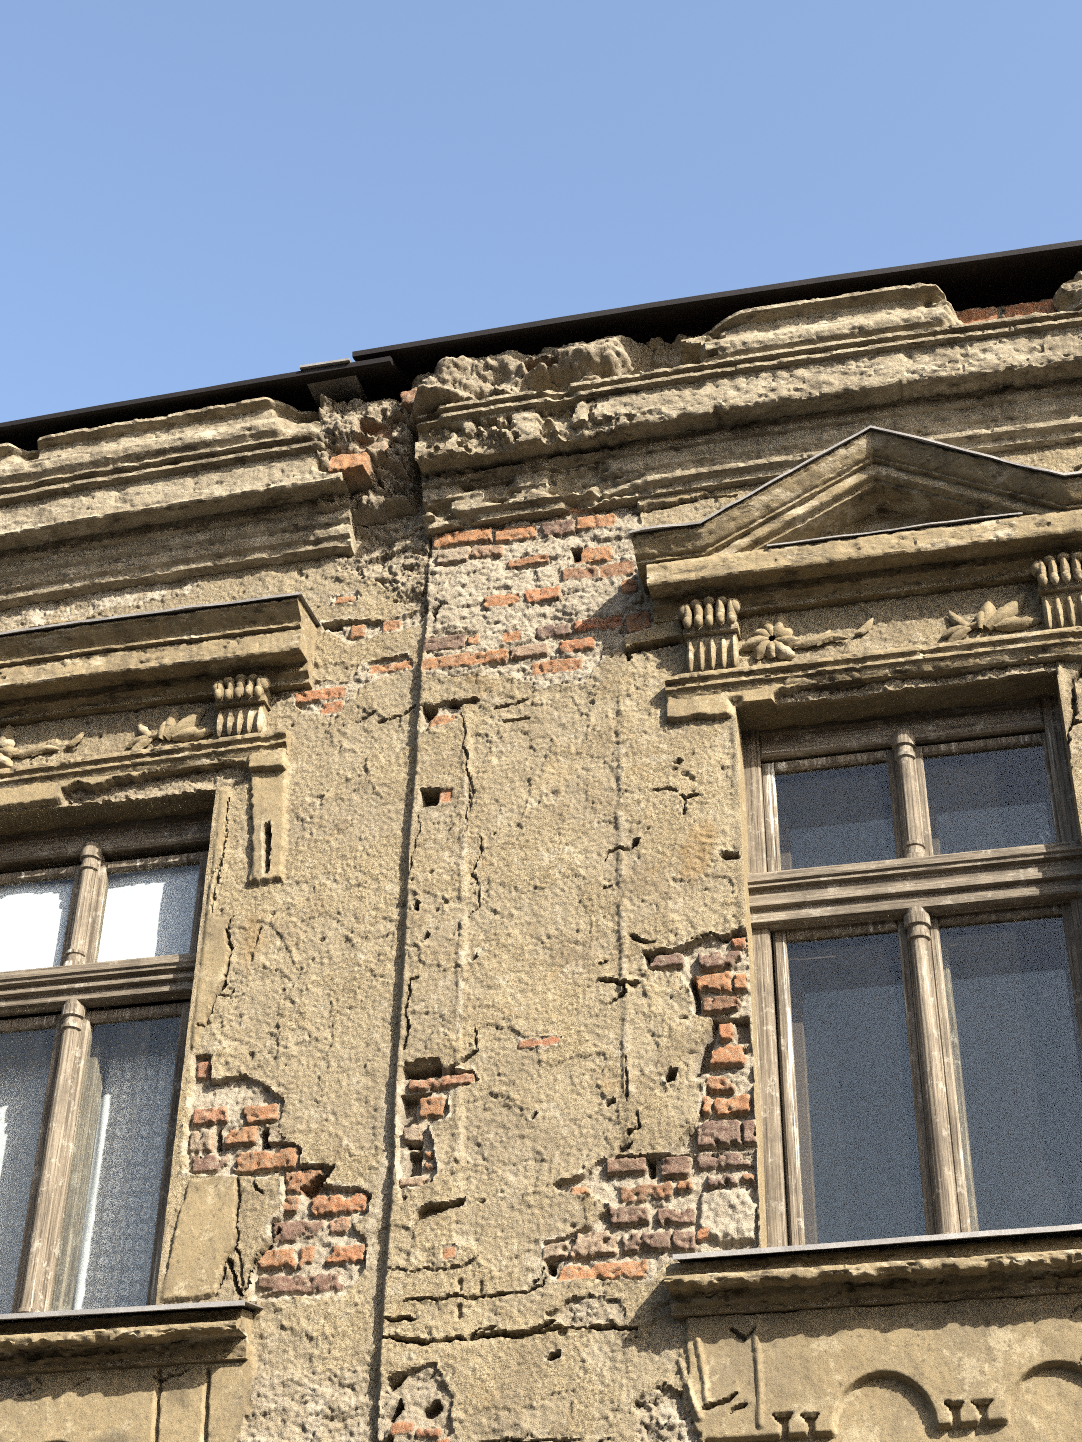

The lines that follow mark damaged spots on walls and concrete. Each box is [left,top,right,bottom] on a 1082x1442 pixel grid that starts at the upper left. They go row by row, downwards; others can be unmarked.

spalling [291,334,703,735]
crack [1066,668,1082,769]
crack [354,694,531,922]
crack [399,974,419,1052]
crack [446,1027,481,1076]
crack [214,1176,282,1300]
spalling [178,1049,375,1304]
spalling [393,1053,482,1227]
spalling [539,926,761,1328]
spalling [234,1358,460,1442]
spalling [540,1347,565,1364]